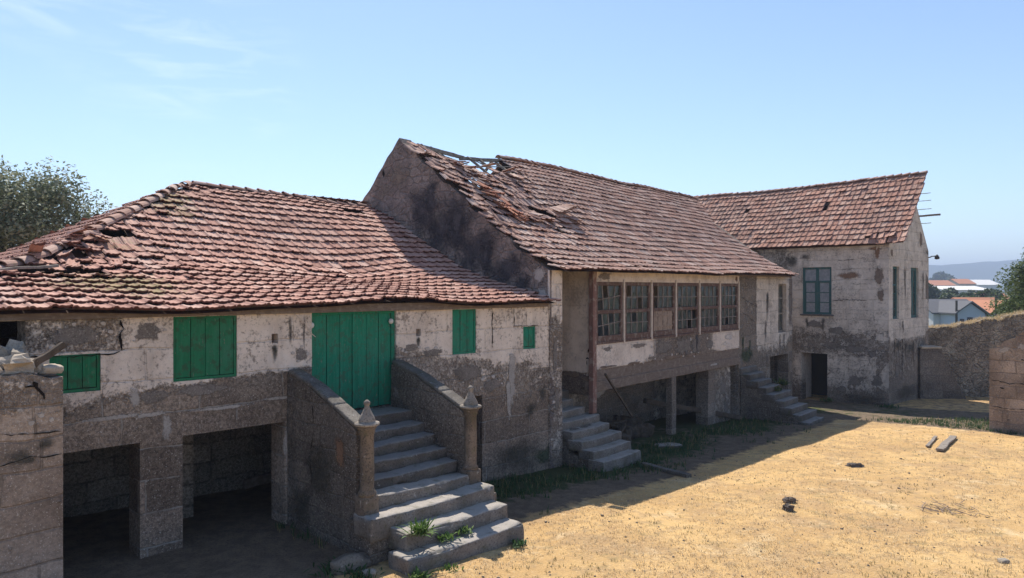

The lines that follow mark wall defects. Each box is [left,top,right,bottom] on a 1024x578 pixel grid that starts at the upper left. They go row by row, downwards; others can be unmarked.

peeling [872,266,886,304]
crack [113,320,124,354]
peeling [132,317,167,342]